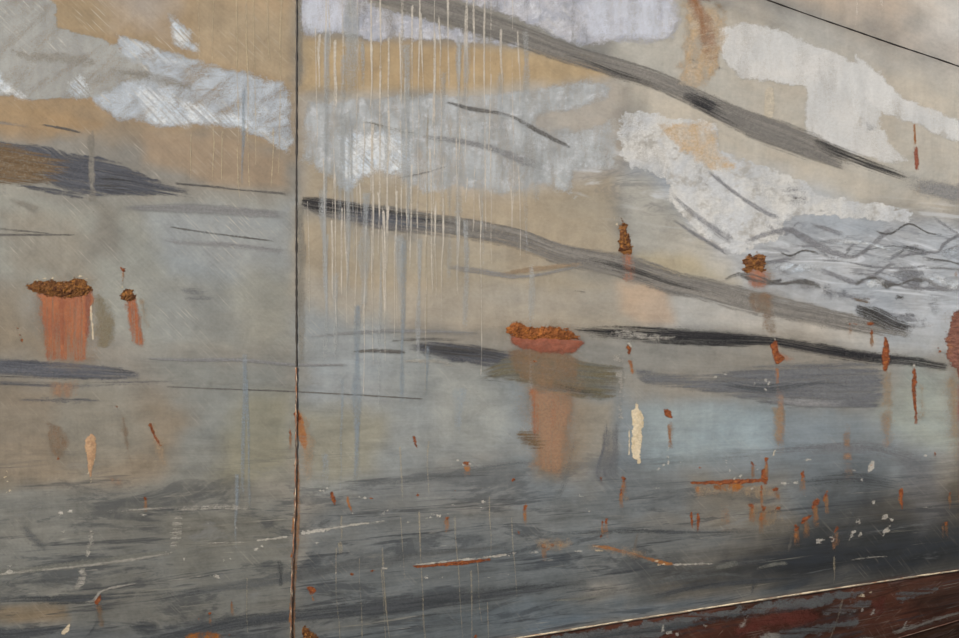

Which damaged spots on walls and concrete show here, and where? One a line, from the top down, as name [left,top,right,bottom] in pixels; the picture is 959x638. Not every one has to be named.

rust [676,0,730,88]
rust [614,217,635,281]
rust [18,267,150,399]
rust [504,315,588,479]
rust [742,251,794,451]
rust [849,322,896,448]
rust [911,364,926,424]
rust [934,310,959,459]
rust [289,410,319,638]
peeling [892,613,959,634]